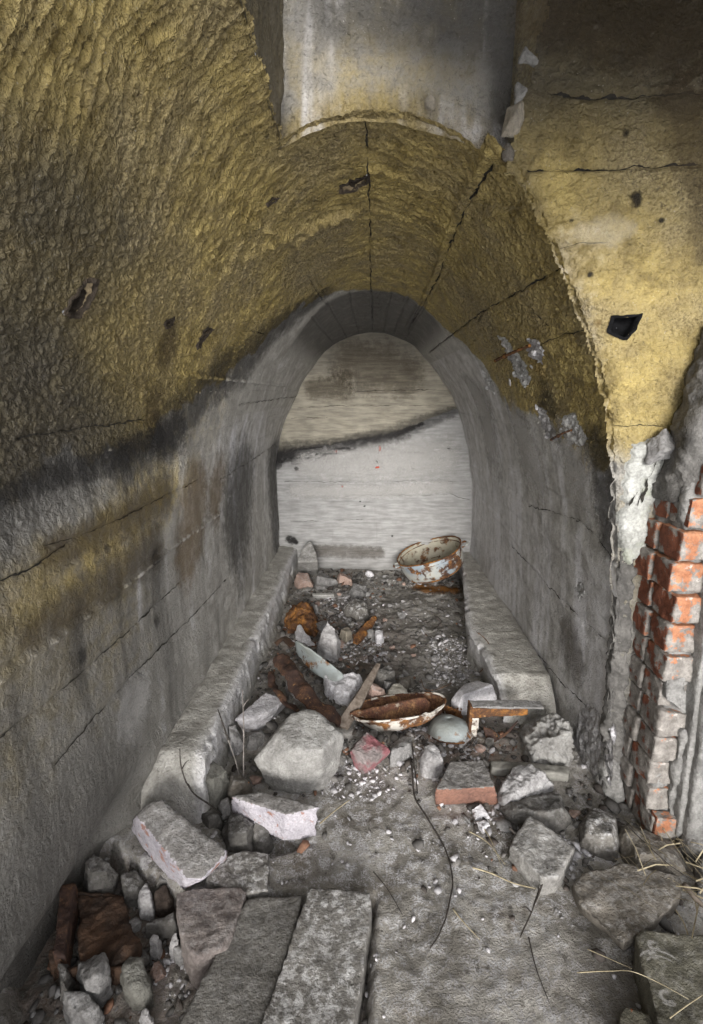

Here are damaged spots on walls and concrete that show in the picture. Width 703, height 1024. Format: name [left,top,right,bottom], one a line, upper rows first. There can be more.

crack [553,90,702,101]
crack [527,162,698,172]
spalling [76,277,94,317]
crack [365,121,373,325]
crack [408,164,493,331]
crack [431,242,618,351]
spalling [497,335,548,388]
damp [276,422,424,471]
spalling [535,404,588,447]
crack [0,481,195,581]
peeling [610,438,664,565]
crack [0,580,226,766]